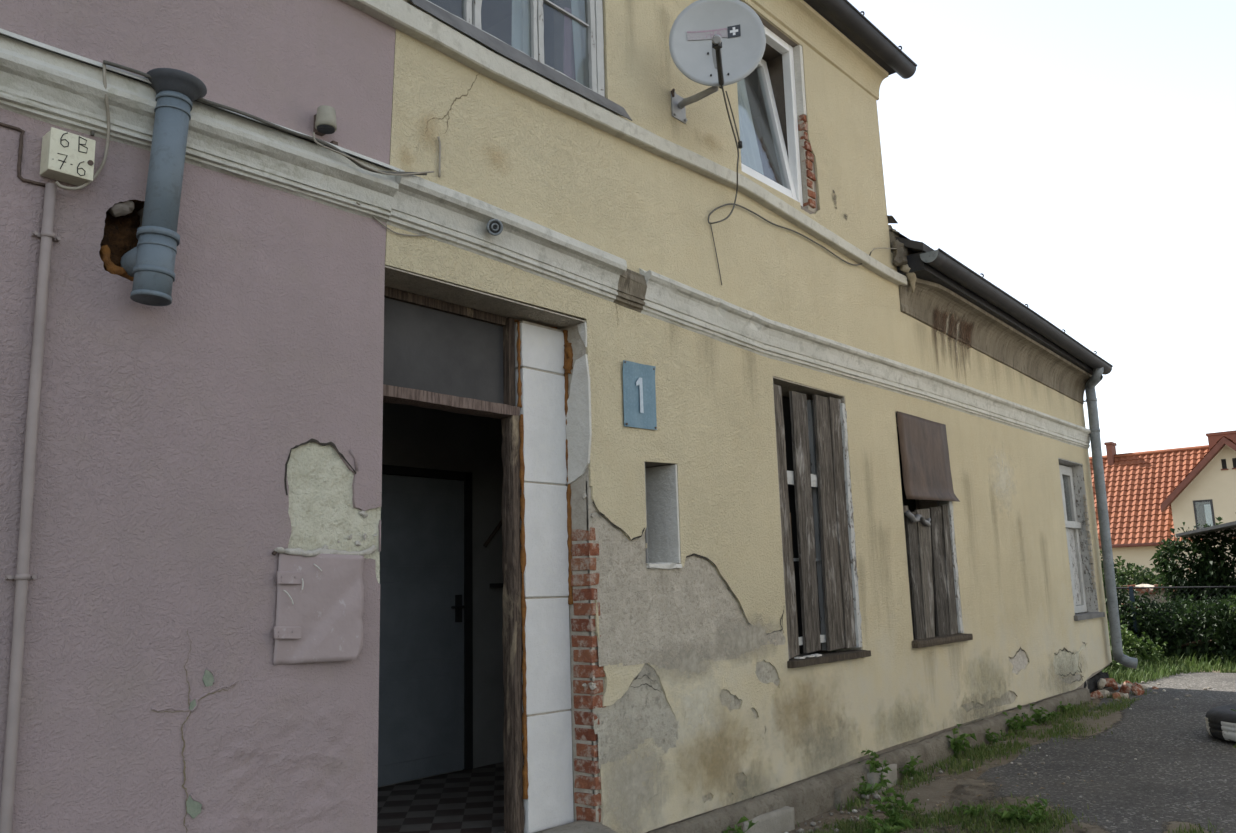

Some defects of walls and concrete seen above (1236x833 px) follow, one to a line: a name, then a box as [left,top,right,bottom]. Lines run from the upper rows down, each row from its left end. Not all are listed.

crack [425,75,477,134]
flaking render [284,439,381,584]
flaking render [588,496,786,769]